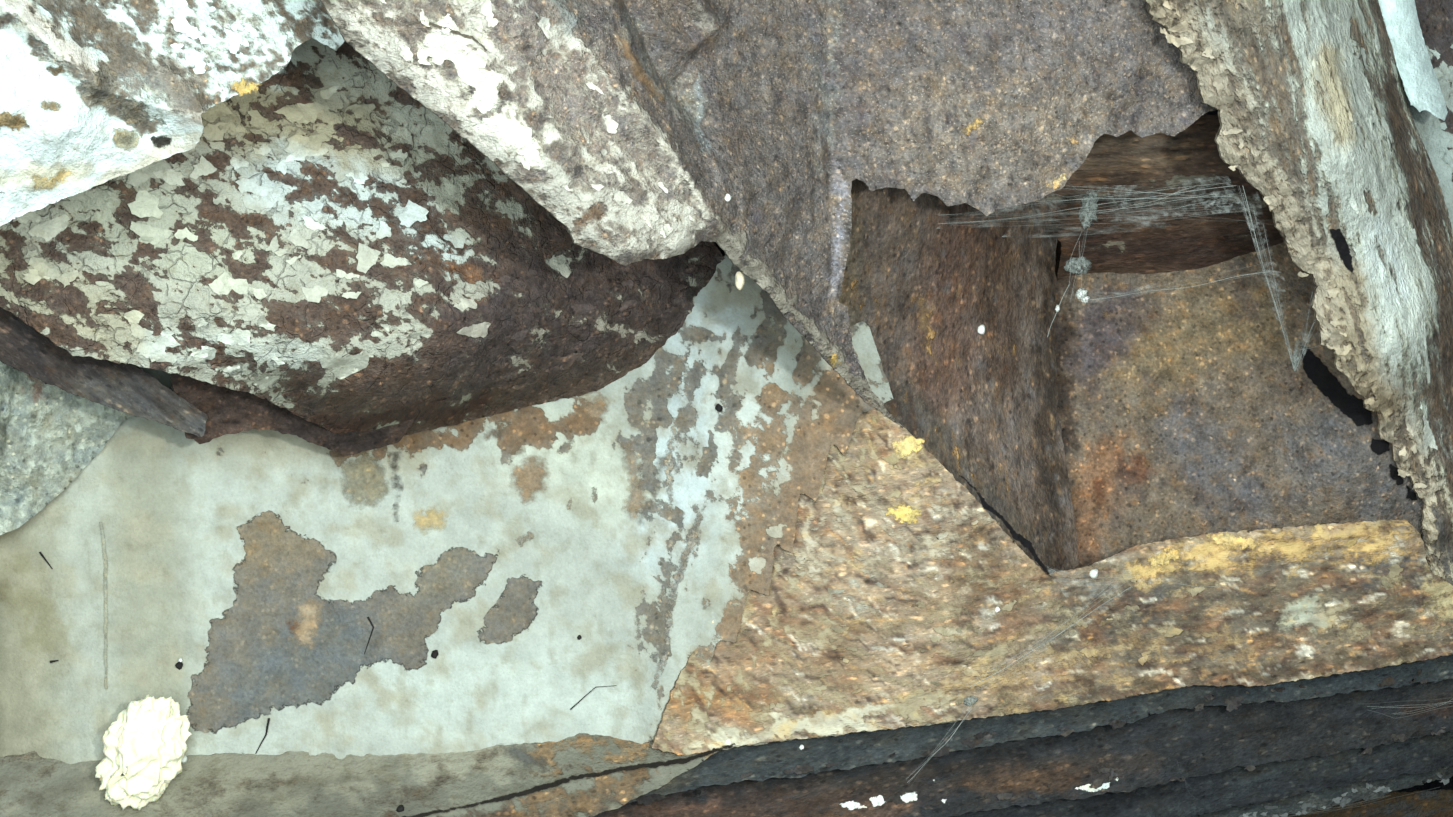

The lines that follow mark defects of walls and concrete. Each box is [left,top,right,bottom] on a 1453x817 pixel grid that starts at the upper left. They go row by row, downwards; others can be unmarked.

peeling [164,0,258,74]
corrosion [231,78,260,96]
peeling [1378,0,1453,130]
peeling [13,86,376,288]
peeling [548,115,633,206]
peeling [301,200,429,303]
peeling [124,250,276,372]
peeling [319,323,390,379]
peeling [453,297,496,338]
peeling [1389,402,1438,490]
peeling [186,510,543,734]
corrosion [651,408,1453,756]